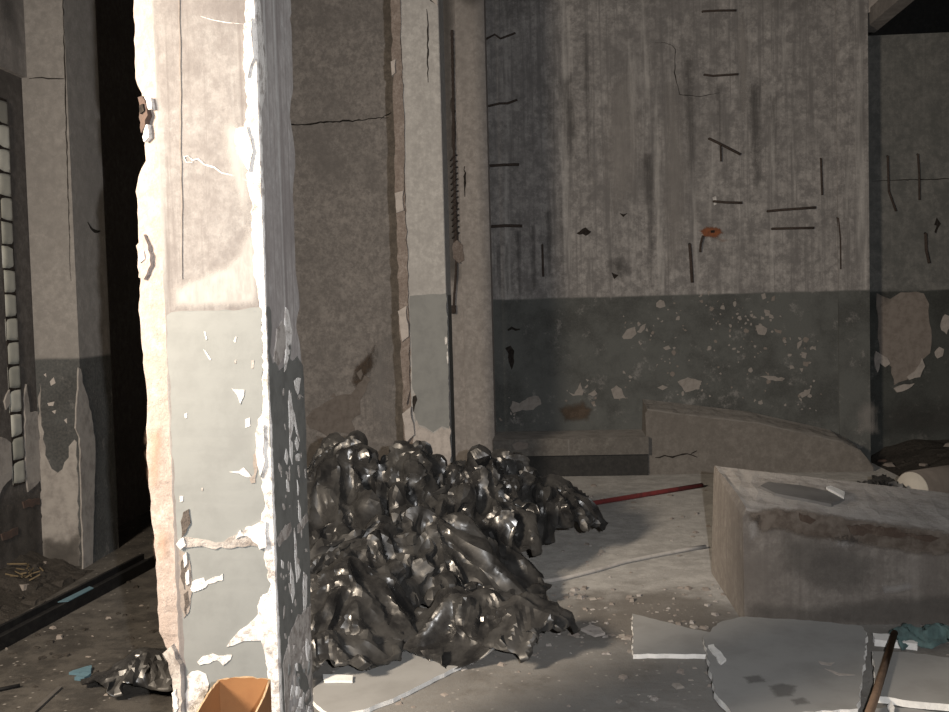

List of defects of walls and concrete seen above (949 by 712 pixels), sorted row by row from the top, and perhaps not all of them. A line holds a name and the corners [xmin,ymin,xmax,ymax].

crack [426,0,434,77]
crack [291,112,392,125]
corrosion [700,227,722,238]
peeling [162,0,371,712]
peeling [611,371,632,401]
peeling [622,300,711,397]
peeling [699,290,818,405]
peeling [874,292,949,392]
peeling [23,367,96,569]